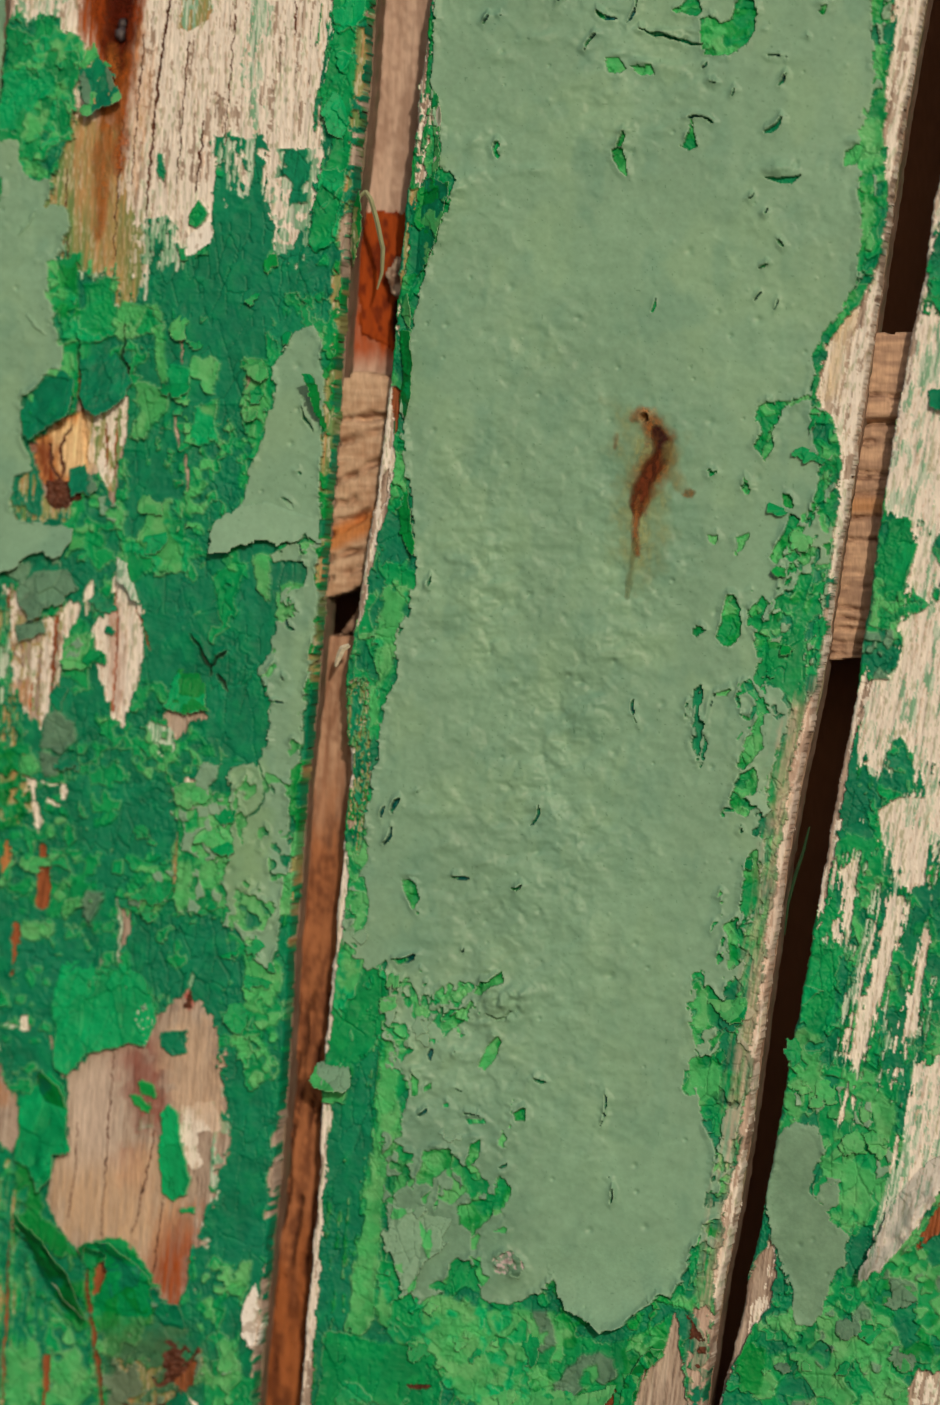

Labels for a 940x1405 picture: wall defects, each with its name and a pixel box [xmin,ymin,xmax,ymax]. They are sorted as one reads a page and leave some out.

rust [93,0,142,237]
peeling [0,0,376,316]
peeling [0,352,151,731]
peeling [137,495,322,554]
peeling [351,89,449,651]
rust [631,409,672,561]
peeling [0,776,52,911]
peeling [490,0,940,1405]
peeling [0,881,276,1334]
peeling [241,1284,269,1352]
peeling [301,840,368,1405]
spalling [380,1127,517,1317]